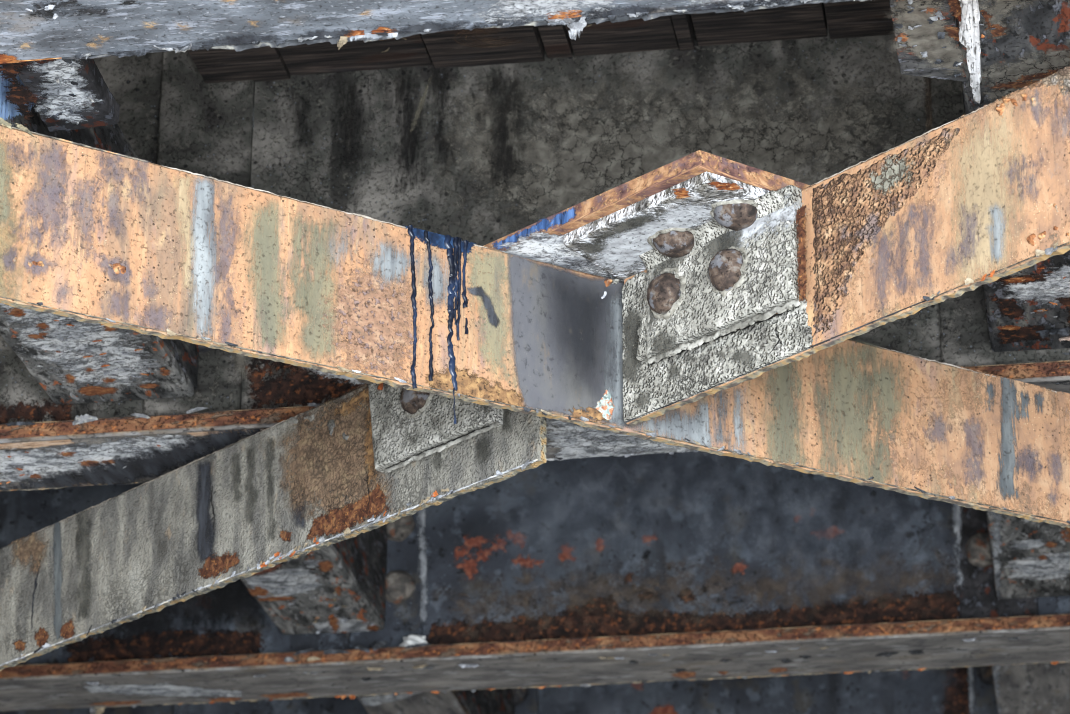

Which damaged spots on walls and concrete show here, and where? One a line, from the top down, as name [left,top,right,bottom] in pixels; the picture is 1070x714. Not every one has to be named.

peeling [892,0,965,78]
peeling [978,0,1032,53]
peeling [981,49,1070,99]
rust [4,143,147,274]
rust [796,66,1070,346]
rust [8,308,50,339]
rust [100,256,171,330]
rust [0,398,76,424]
rust [243,258,526,542]
rust [878,365,1070,560]
rust [197,551,240,579]
rust [12,619,267,663]